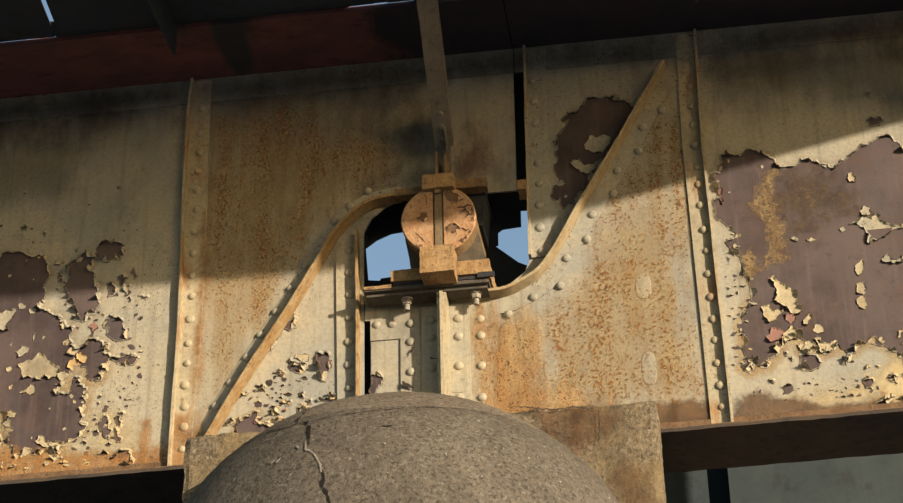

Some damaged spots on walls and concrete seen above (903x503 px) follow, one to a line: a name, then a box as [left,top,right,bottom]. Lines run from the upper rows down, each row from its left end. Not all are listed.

peeling [550,94,635,210]
peeling [709,115,903,404]
peeling [0,214,150,472]
rust [0,412,201,476]
spalling [225,350,337,433]
crack [240,407,407,446]
spalling [369,370,384,394]
crack [439,406,603,443]
rust [472,303,591,413]
rust [656,400,711,423]
rust [733,359,903,417]
crack [320,470,331,503]